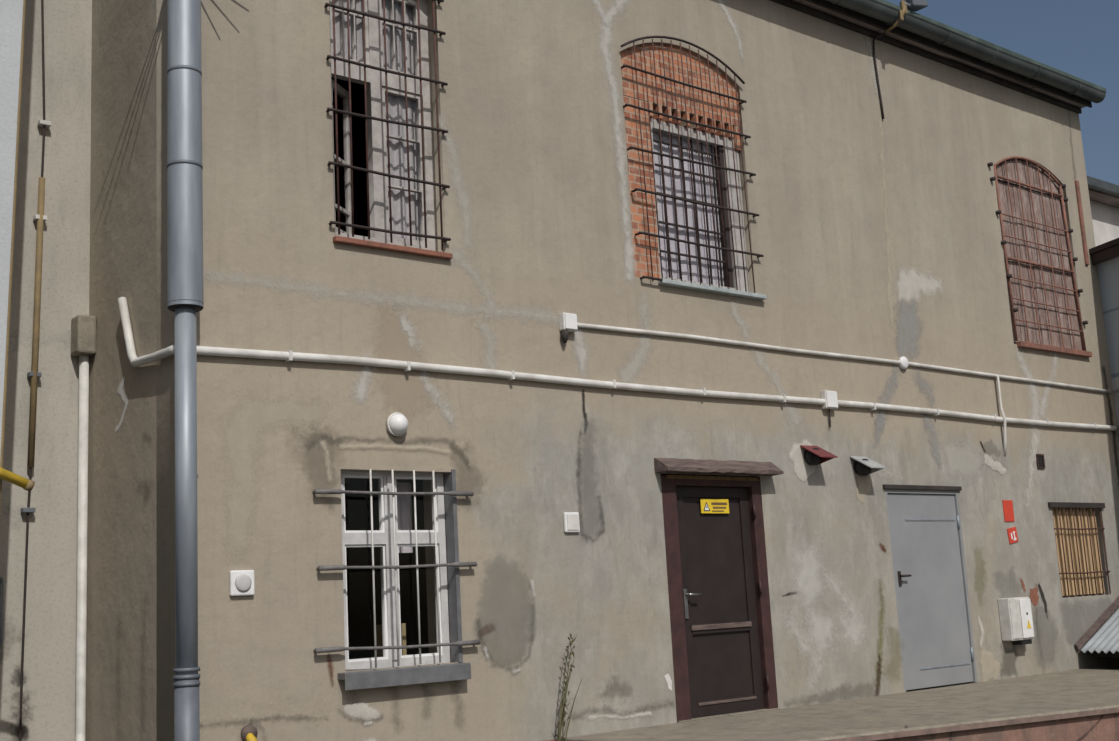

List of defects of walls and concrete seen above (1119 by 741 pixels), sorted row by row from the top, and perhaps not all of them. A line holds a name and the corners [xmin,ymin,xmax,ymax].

crack [716,0,743,57]
crack [593,0,634,280]
peeling [344,702,382,741]